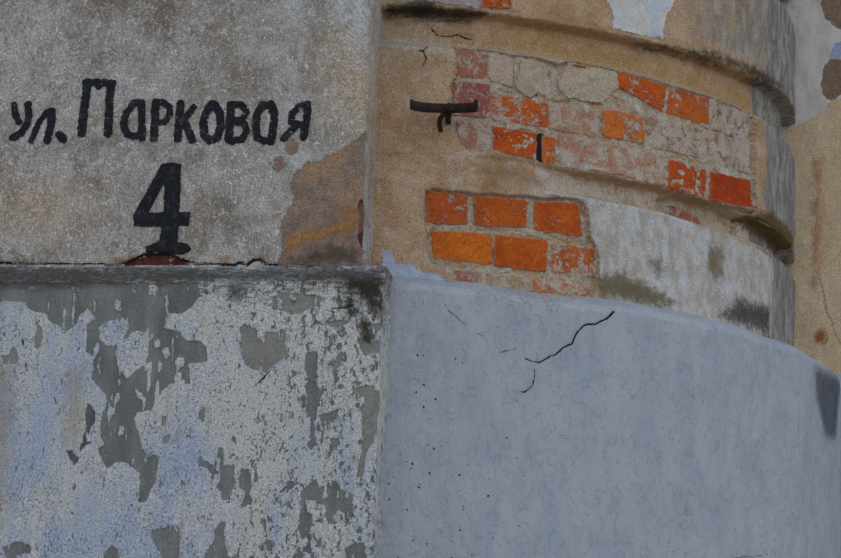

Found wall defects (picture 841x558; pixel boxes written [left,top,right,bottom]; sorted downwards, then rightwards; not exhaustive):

flaking render [821,0,841,29]
flaking render [278,130,367,267]
flaking render [424,48,774,337]
flaking render [780,59,841,374]
peeling [0,281,207,502]
peeling [240,324,287,373]
peeling [304,351,339,450]
peeling [352,386,379,477]
crack [500,311,615,393]
peeling [204,522,241,558]
peeling [198,447,258,513]
peeling [280,480,353,558]